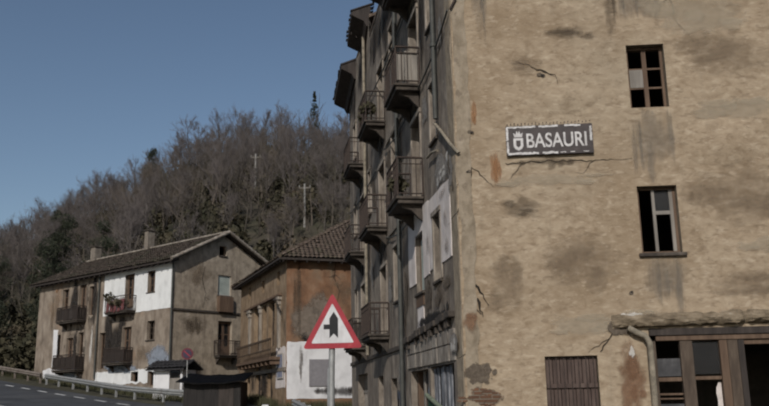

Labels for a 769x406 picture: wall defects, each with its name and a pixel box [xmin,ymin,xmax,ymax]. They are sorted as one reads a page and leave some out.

peeling [434,149,453,192]
rust [491,159,501,181]
crack [506,158,631,174]
crack [475,285,489,316]
spalling [457,363,504,406]